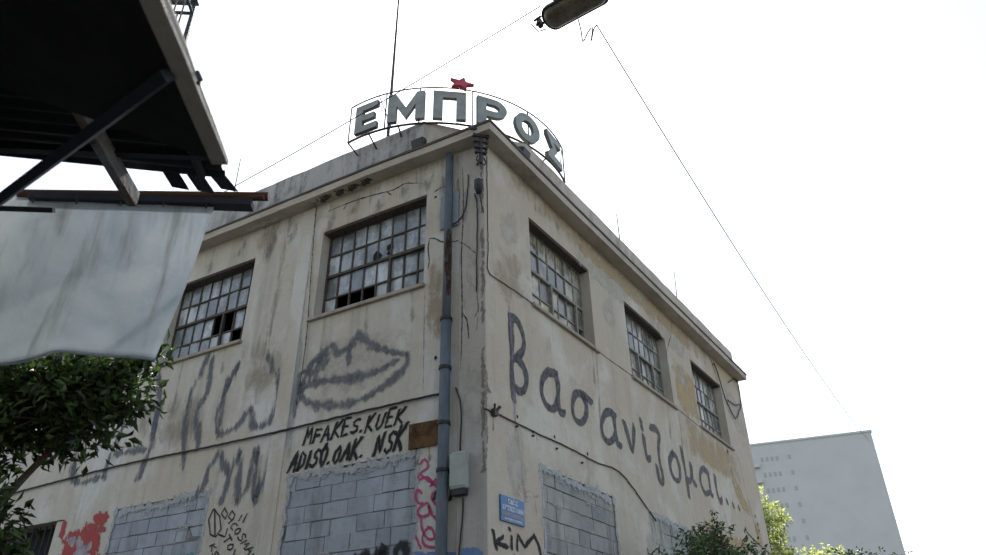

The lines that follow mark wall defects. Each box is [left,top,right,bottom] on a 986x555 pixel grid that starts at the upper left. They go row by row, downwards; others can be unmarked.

rust [444,229,452,295]